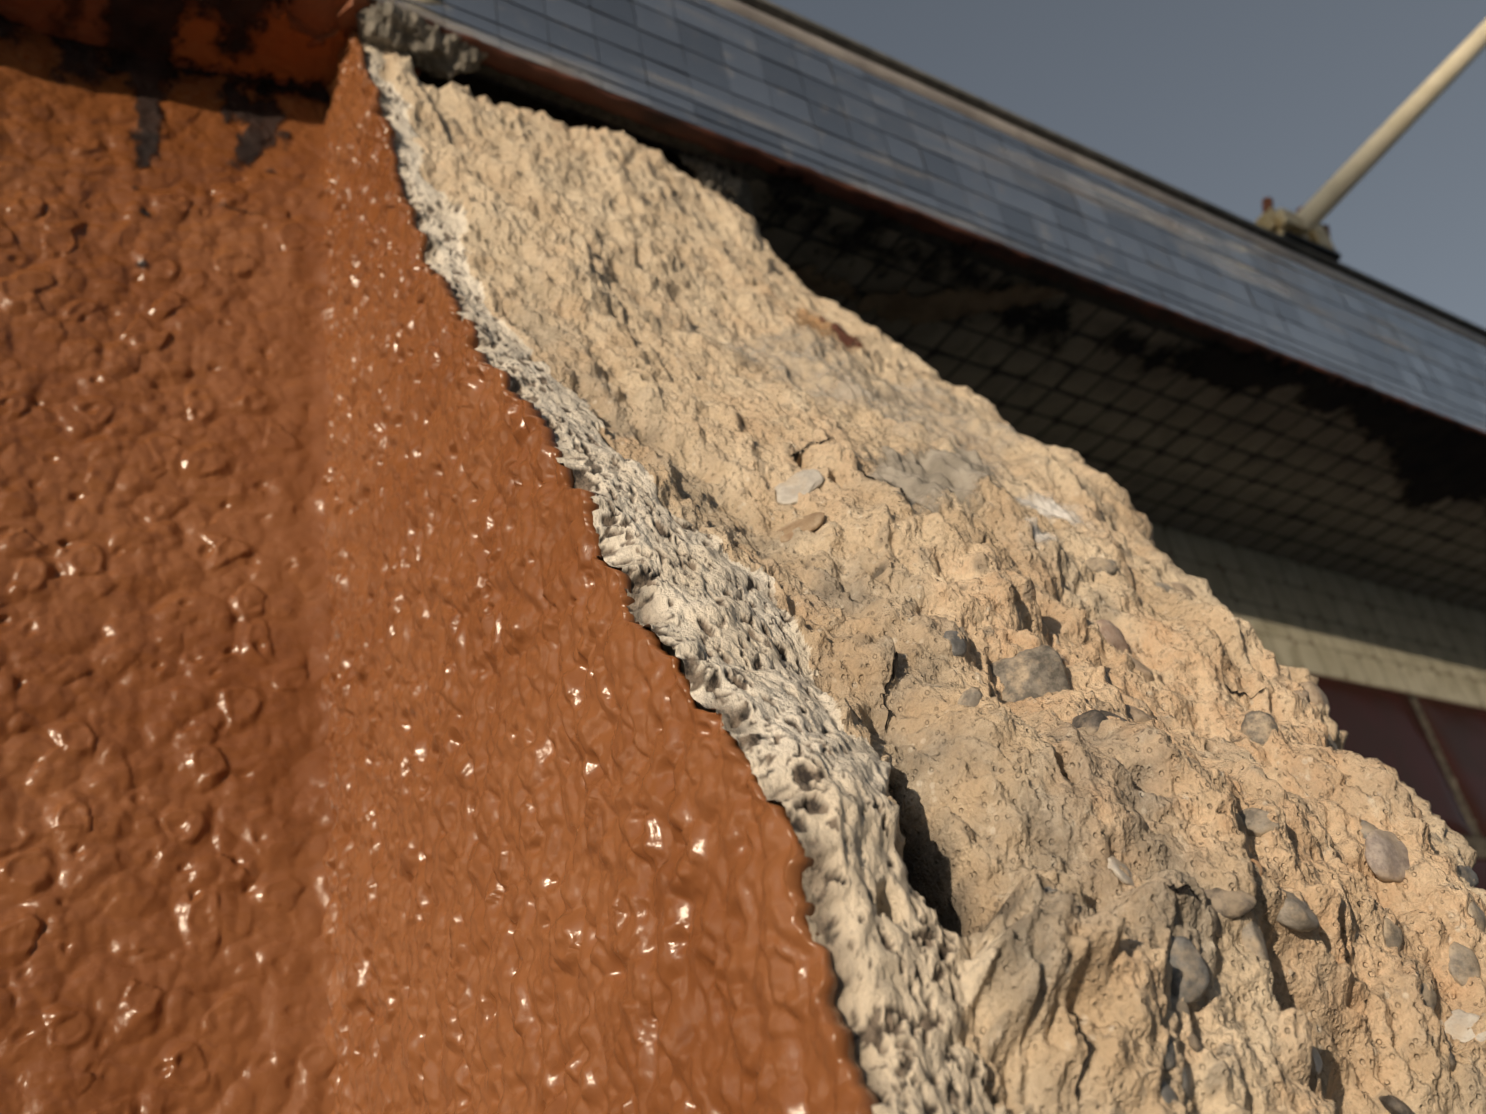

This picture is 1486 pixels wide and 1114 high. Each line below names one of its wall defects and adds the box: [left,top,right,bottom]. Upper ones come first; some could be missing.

damp [0,0,331,172]
peeling [169,0,353,85]
rust [794,309,867,355]
damp [1101,330,1486,514]
spalling [360,41,1486,1114]
crack [882,651,898,731]